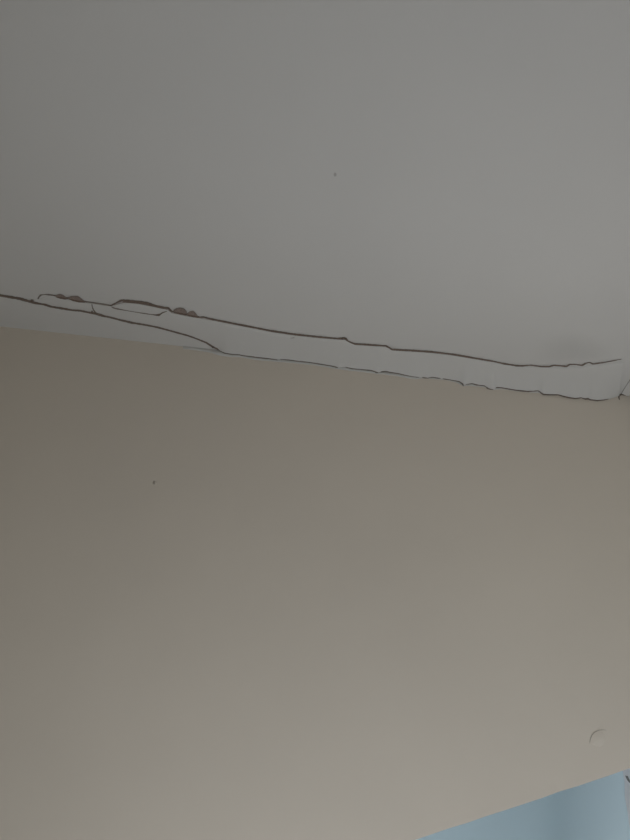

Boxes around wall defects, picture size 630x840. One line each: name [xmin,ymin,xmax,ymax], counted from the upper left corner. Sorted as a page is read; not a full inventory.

crack [0,294,626,401]